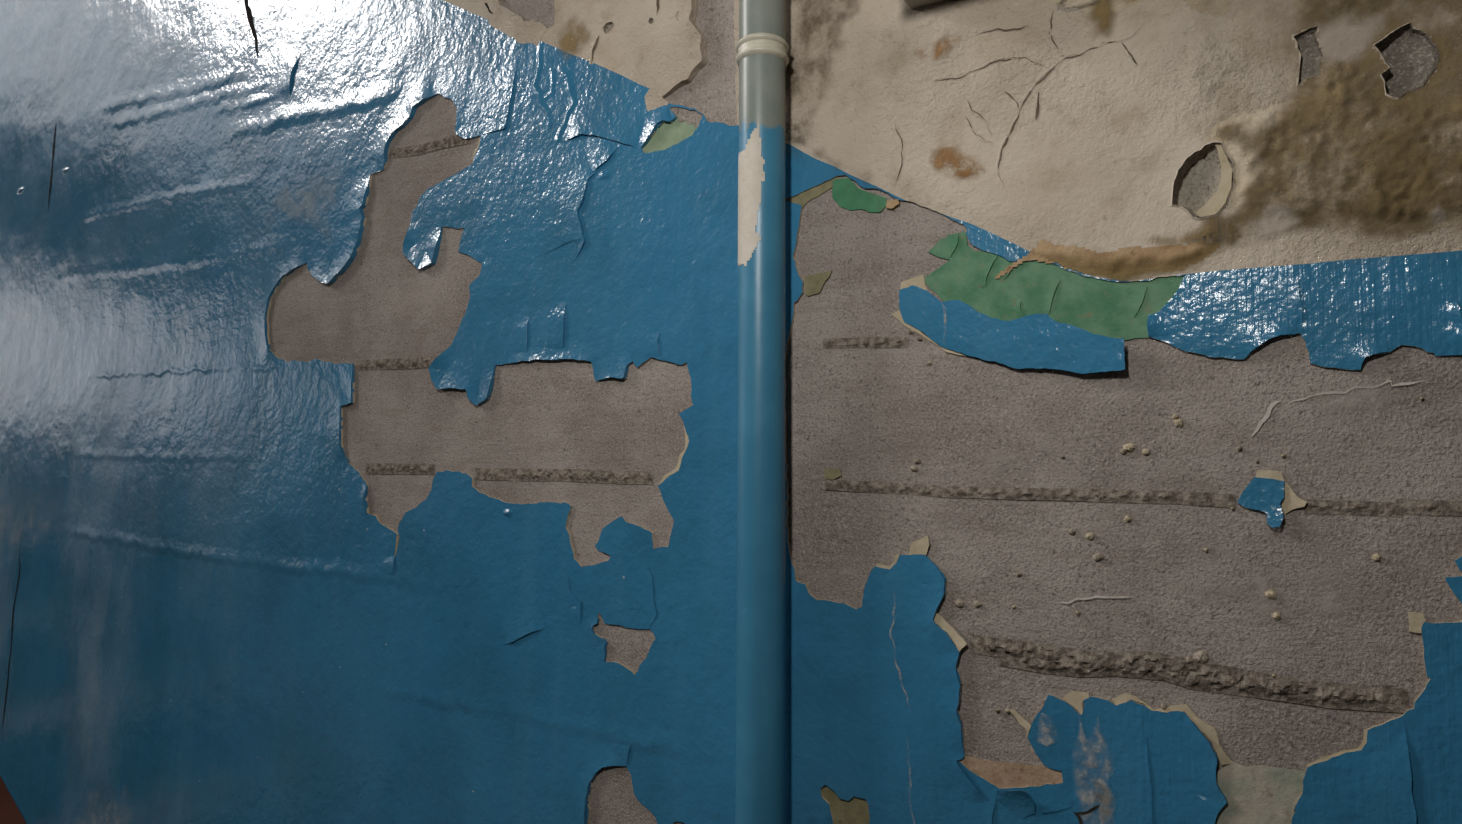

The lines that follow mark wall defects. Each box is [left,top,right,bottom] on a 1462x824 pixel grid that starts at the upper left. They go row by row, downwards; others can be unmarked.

spalling [472,0,555,47]
spalling [528,0,765,266]
crack [930,9,1146,190]
spalling [1170,141,1237,221]
water stain [1048,0,1462,281]
spalling [1293,25,1323,87]
spalling [1372,22,1440,100]
peeling [252,58,693,587]
peeling [785,176,1462,824]
peeling [580,608,656,674]
peeling [567,743,685,824]